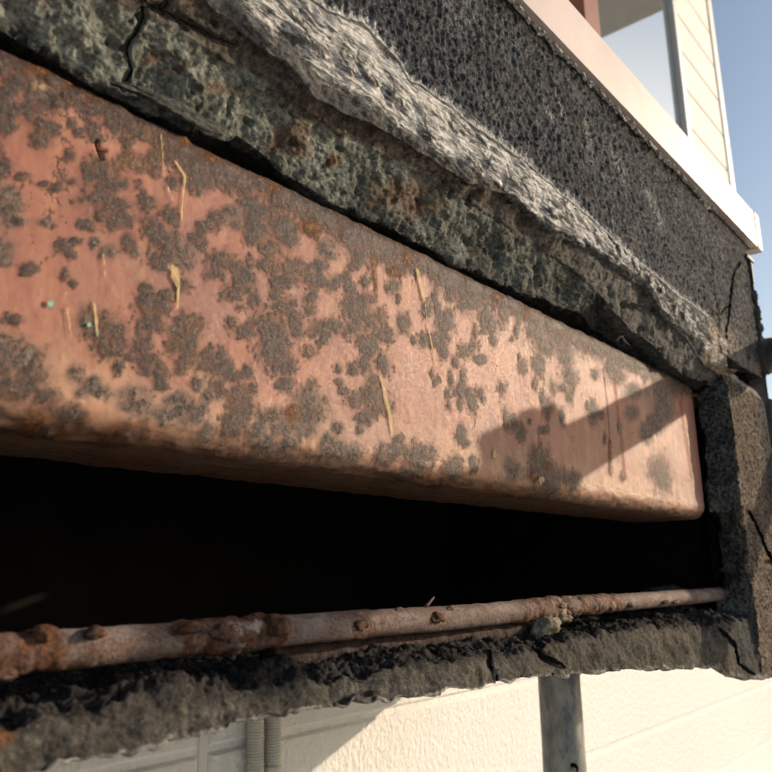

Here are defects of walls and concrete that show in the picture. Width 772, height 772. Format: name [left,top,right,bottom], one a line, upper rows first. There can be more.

crack [125,0,234,82]
rust [0,49,690,502]
crack [720,263,749,386]
peeling [750,268,764,345]
peeling [749,363,772,449]
crack [748,510,772,563]
crack [488,649,498,681]
crack [536,646,567,668]